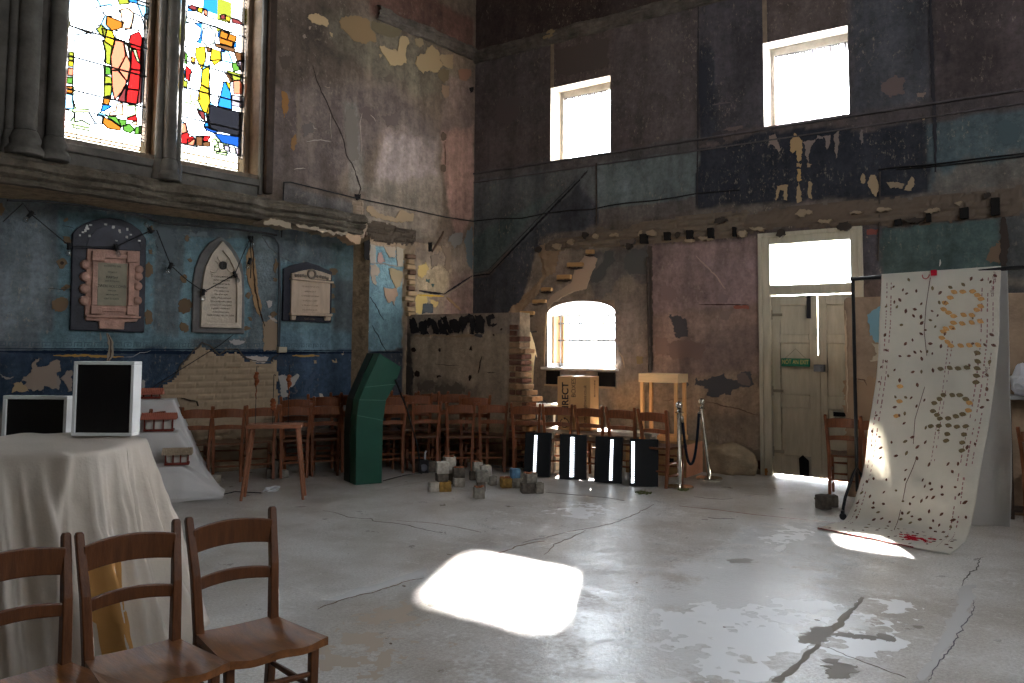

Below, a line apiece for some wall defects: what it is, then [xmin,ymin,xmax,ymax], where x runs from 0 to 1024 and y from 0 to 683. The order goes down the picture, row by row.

peeling [303,13,454,74]
spalling [252,194,444,315]
spalling [509,131,1024,313]
peeling [0,359,73,393]
peeling [158,248,299,472]
crack [473,492,654,560]
water stain [595,596,925,683]
crack [828,558,981,680]